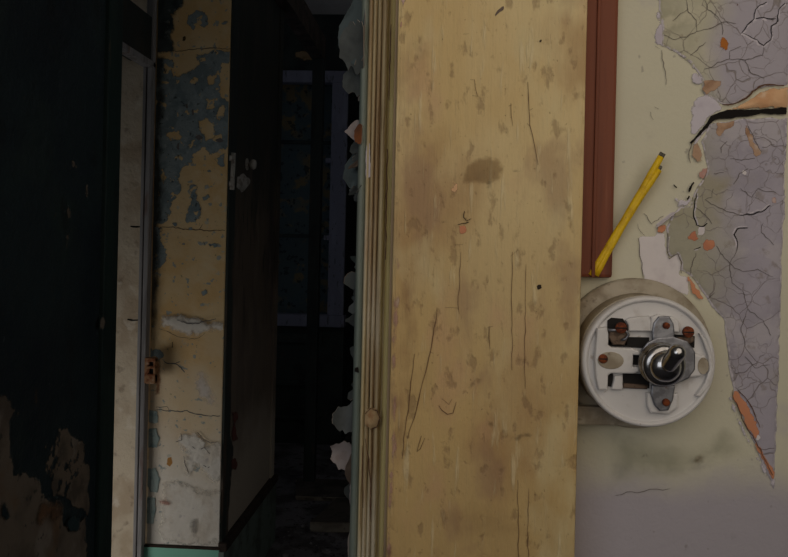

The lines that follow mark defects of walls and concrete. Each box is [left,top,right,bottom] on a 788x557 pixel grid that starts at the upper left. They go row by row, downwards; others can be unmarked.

peeling [338,0,366,101]
peeling [154,50,230,270]
peeling [343,120,371,202]
crack [688,84,788,163]
peeling [638,0,788,489]
peeling [0,395,90,557]
peeling [148,410,160,448]
flaking render [146,432,221,545]
crack [158,406,219,417]
peeling [330,383,353,500]